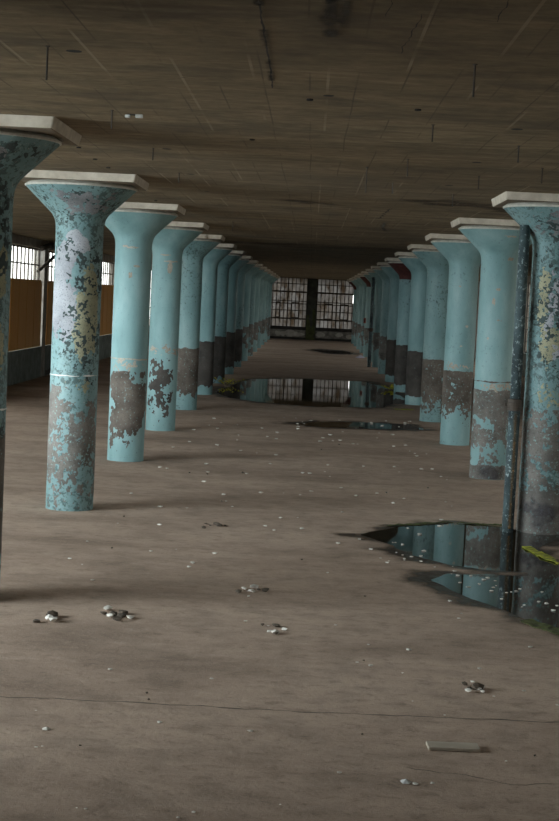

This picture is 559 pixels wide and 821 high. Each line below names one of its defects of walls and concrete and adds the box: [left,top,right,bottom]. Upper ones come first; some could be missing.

peeling [0,141,39,298]
peeling [37,188,119,510]
peeling [109,317,305,449]
peeling [335,321,511,480]
peeling [516,383,559,535]
peeling [523,211,559,380]